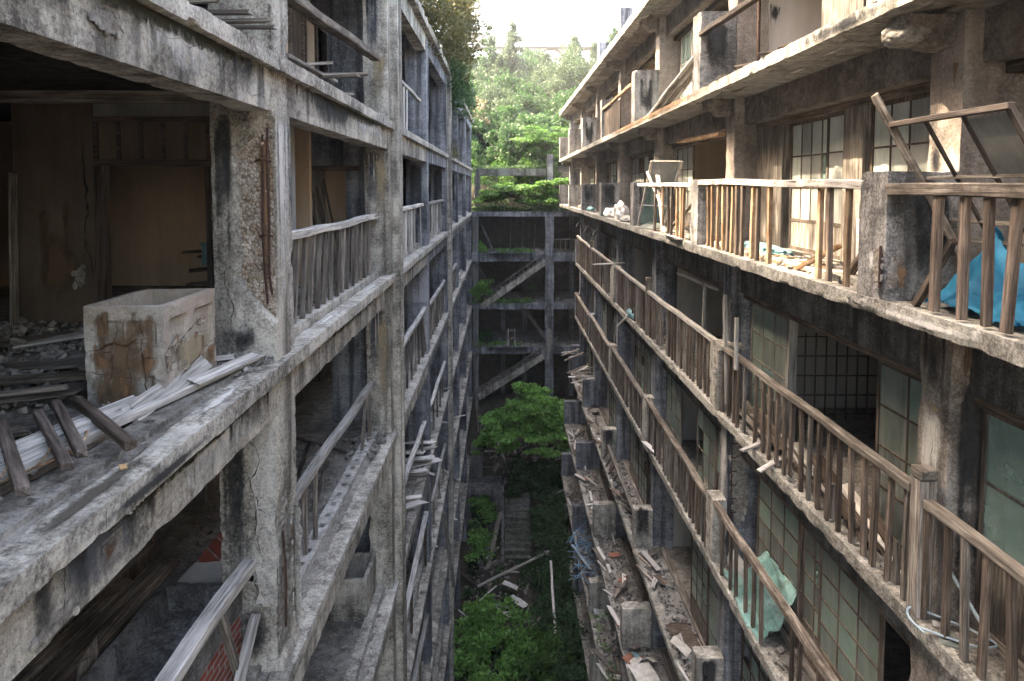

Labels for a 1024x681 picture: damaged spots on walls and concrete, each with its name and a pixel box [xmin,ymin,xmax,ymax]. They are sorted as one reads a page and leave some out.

damp [641,80,652,110]
damp [214,118,232,214]
crack [87,268,238,401]
damp [233,329,254,351]